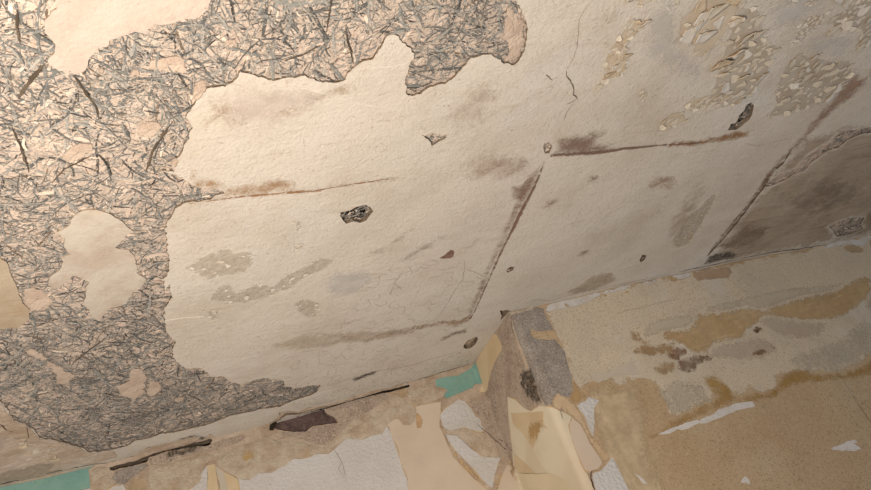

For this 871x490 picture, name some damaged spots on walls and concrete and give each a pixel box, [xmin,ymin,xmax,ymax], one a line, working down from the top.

crack [546,7,587,116]
peeling [594,19,652,93]
peeling [660,0,871,130]
rust [669,132,746,147]
damp [705,78,871,264]
spalling [0,0,528,486]
peeling [446,307,609,461]
damp [707,378,732,407]